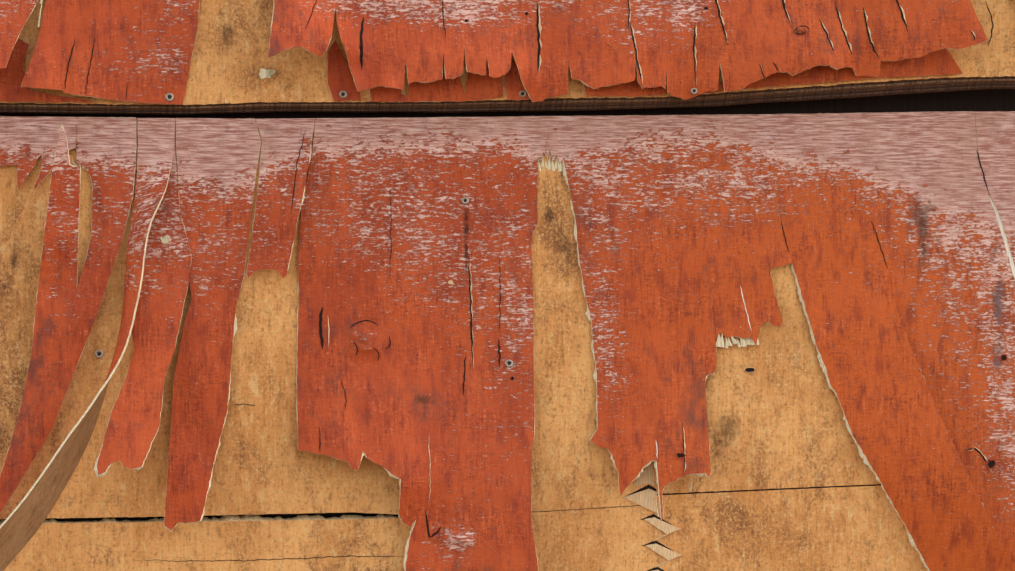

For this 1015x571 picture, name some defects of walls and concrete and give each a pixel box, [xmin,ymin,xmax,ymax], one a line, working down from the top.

crack [977,151,1015,280]
crack [967,447,987,462]